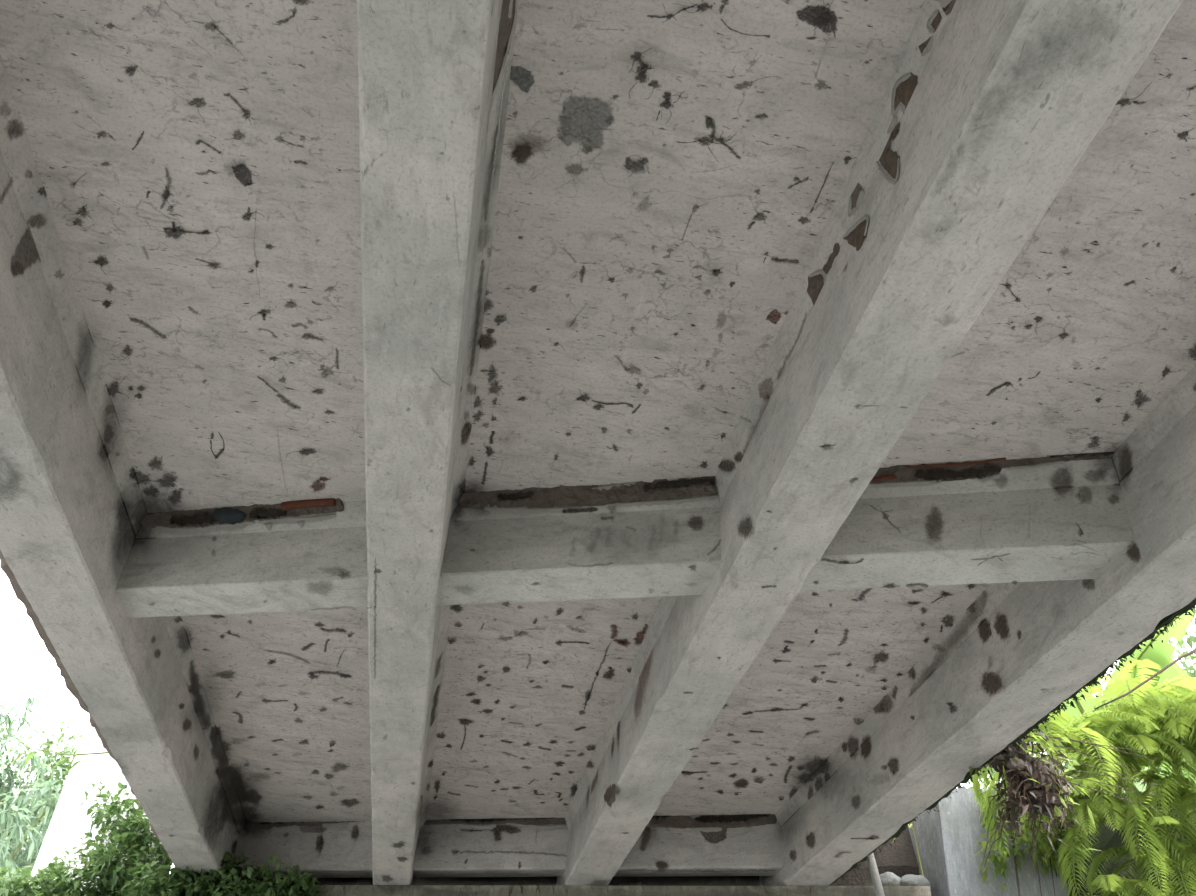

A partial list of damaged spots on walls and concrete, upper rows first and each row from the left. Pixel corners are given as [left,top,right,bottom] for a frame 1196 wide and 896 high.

water stain [787,0,837,40]
peeling [918,0,956,56]
peeling [876,72,918,185]
peeling [807,183,869,305]
spalling [866,452,1114,489]
spalling [459,476,720,515]
spalling [141,498,344,535]
spalling [649,814,777,833]